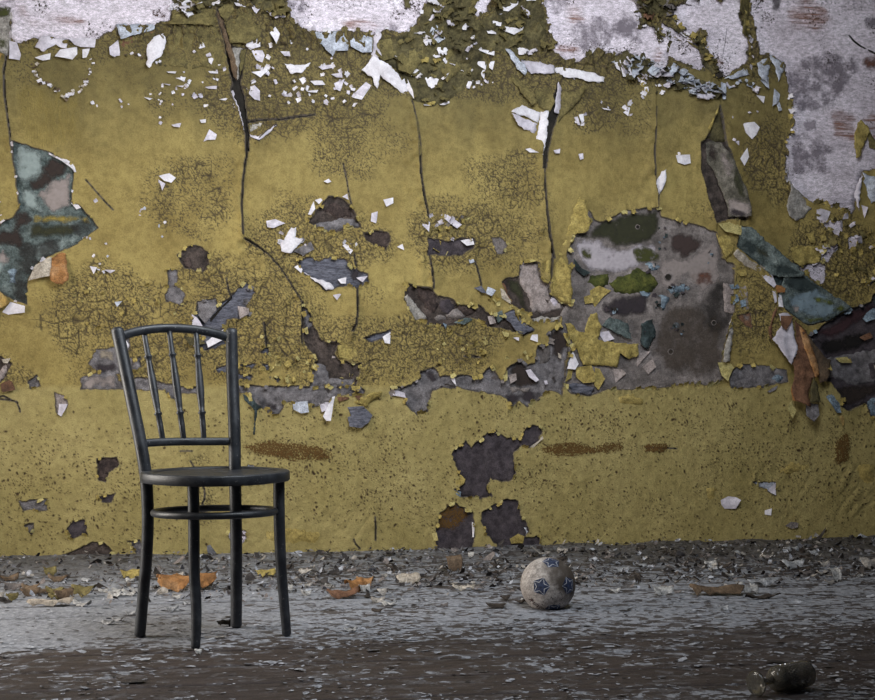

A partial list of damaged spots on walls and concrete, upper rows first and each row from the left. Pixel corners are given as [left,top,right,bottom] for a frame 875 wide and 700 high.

crack [210,282,232,322]
crack [167,3,315,216]
crack [245,239,303,343]
crack [352,56,429,217]
peeling [0,0,875,435]
crack [506,49,587,304]
peeling [432,425,545,549]